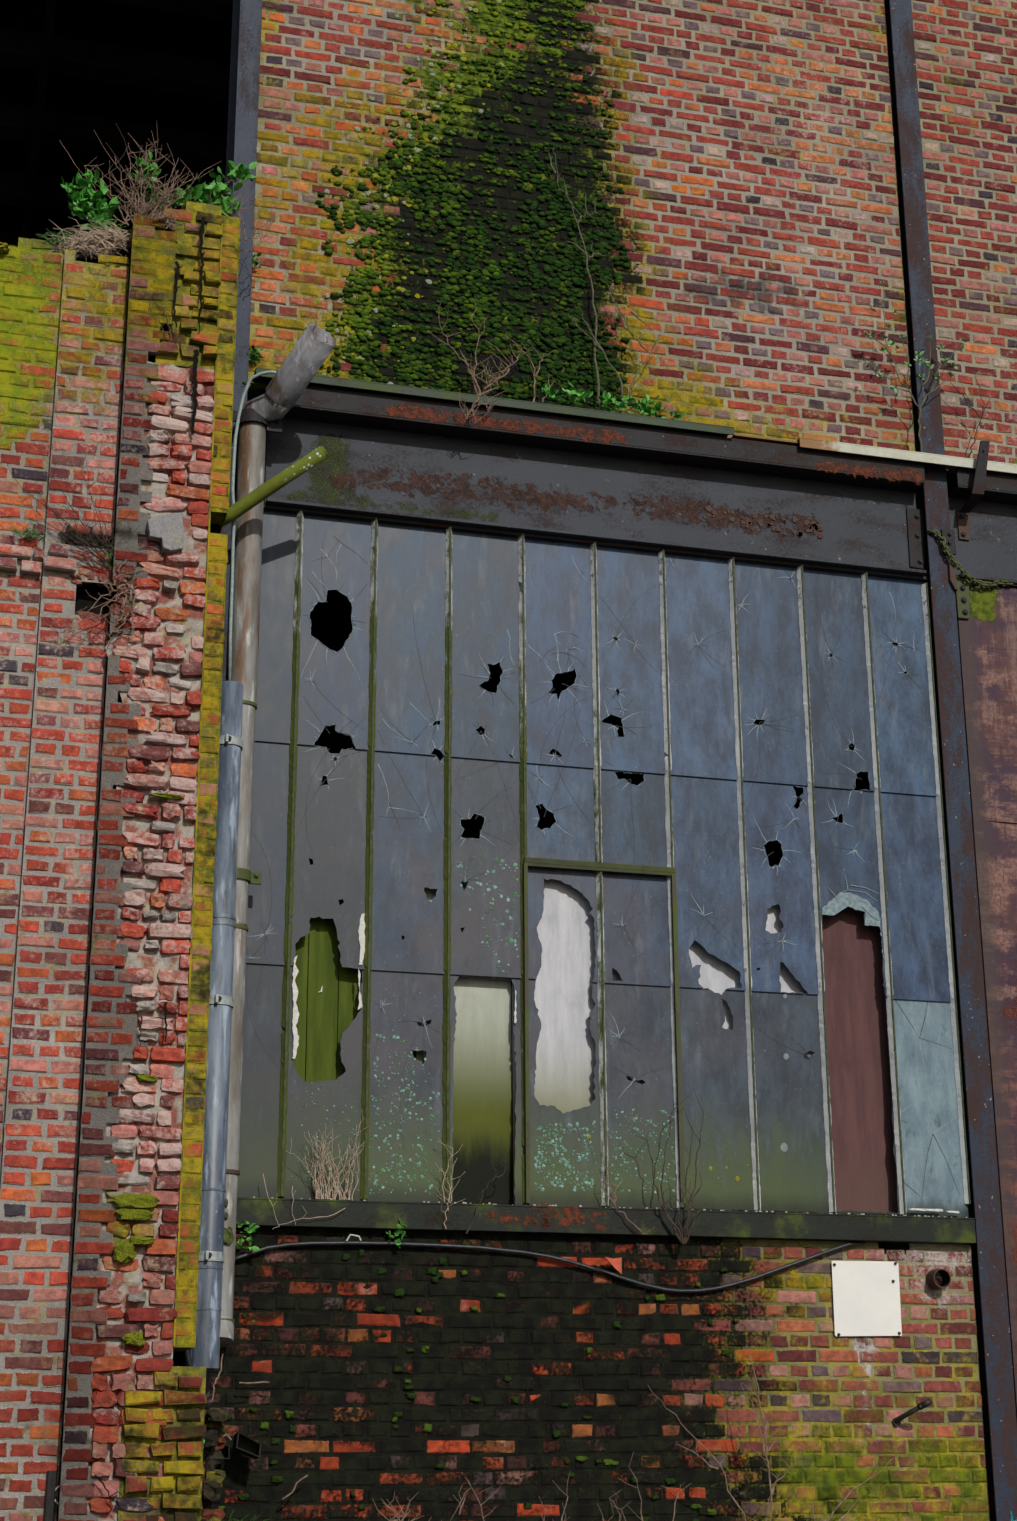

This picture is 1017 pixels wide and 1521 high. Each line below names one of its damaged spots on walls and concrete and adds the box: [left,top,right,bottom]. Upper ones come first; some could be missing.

corrosion [318,467,817,537]
corrosion [815,461,922,485]
spalling [70,361,215,1521]
peeling [357,913,365,1010]
corrosion [484,1203,607,1231]
leakage [853,1339,878,1424]